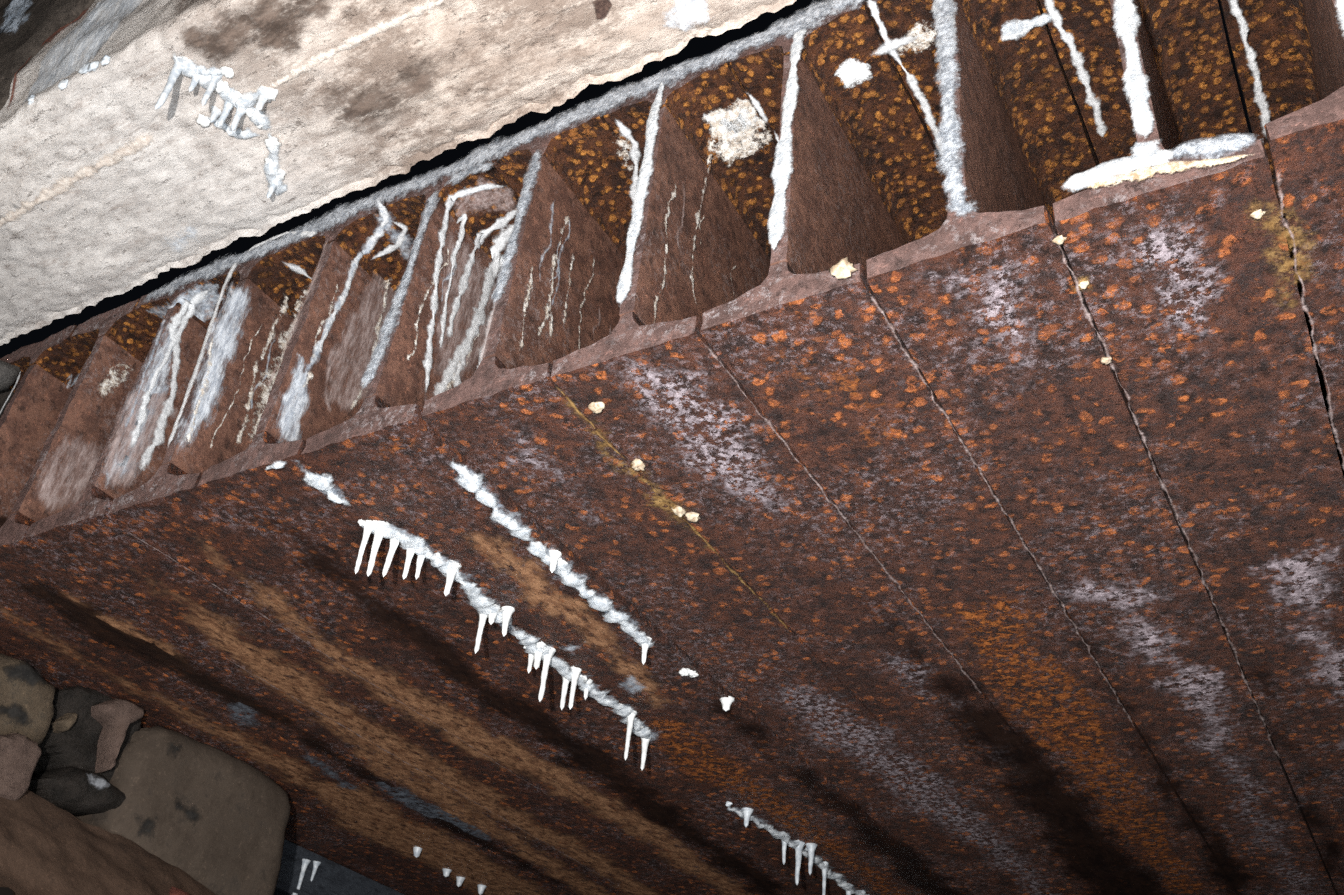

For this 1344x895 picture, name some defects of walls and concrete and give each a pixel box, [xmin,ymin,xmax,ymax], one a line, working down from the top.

water stain [1001,0,1106,137]
water stain [1064,0,1270,190]
water stain [1336,0,1344,30]
water stain [40,0,973,511]
water stain [933,262,1031,366]
water stain [1133,224,1222,336]
corrosion [1251,204,1313,307]
corrosion [595,431,679,517]
corrosion [68,595,174,656]
corrosion [112,584,746,895]
corrosion [474,534,906,895]
corrosion [946,597,1202,894]